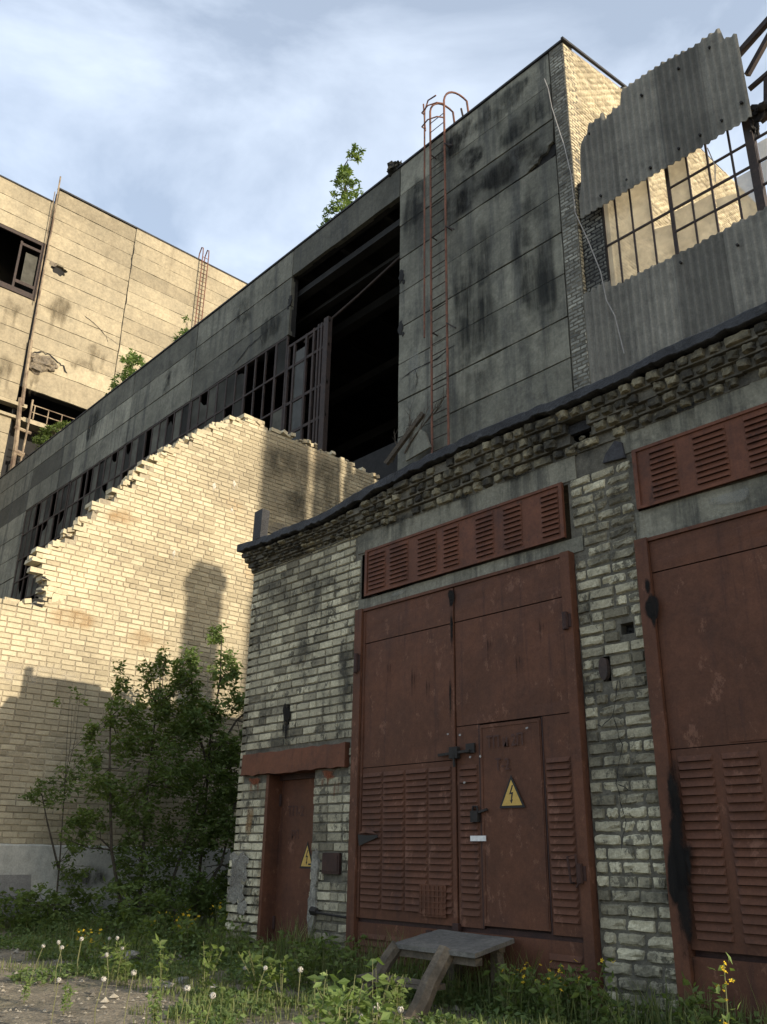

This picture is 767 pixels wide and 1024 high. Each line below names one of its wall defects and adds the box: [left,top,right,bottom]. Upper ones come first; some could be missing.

hole [49,261,65,276]
crack [84,243,135,359]
water stain [515,236,556,304]
spalling [29,352,58,375]
spalling [32,576,50,608]
water stain [667,764,692,942]